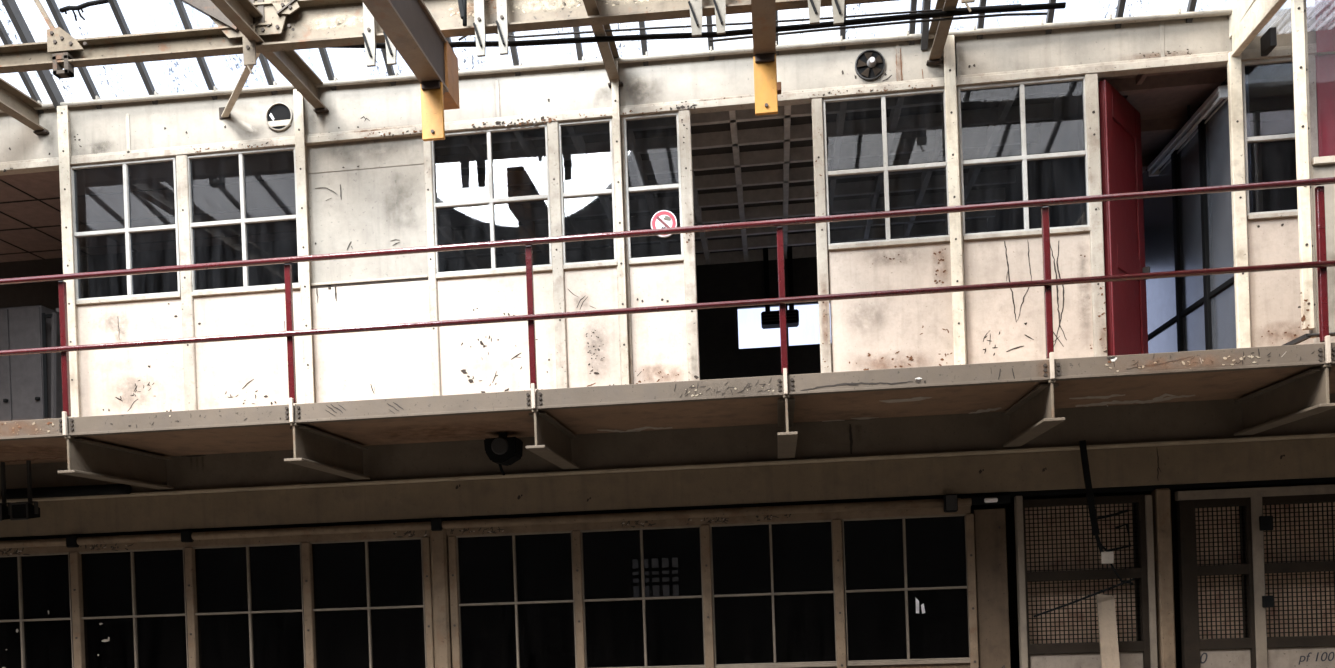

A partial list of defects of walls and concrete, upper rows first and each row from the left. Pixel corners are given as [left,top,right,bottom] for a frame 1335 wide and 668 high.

crack [1004,240,1067,347]